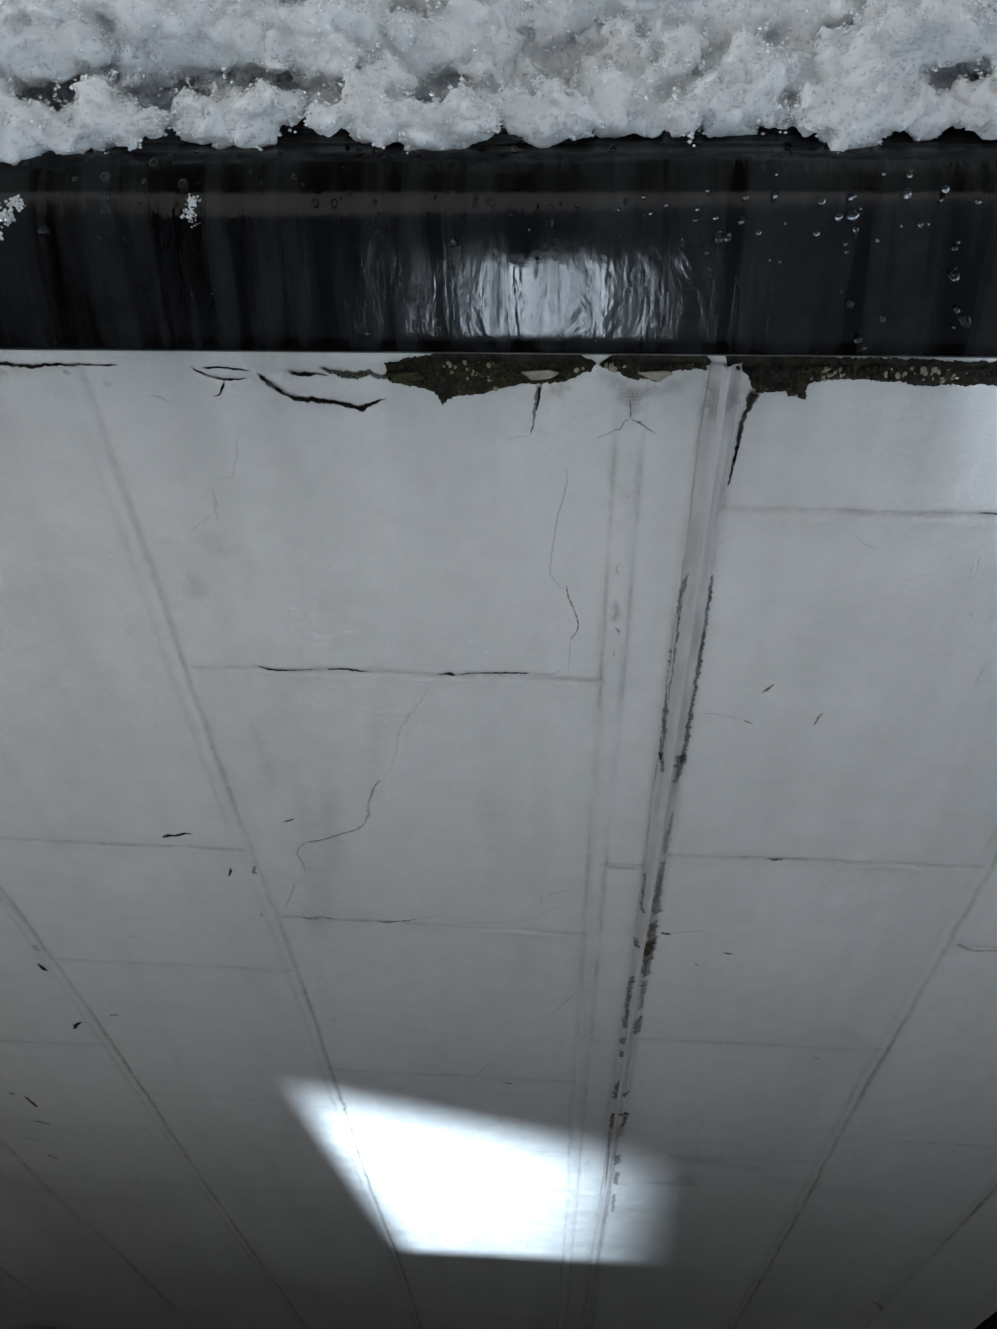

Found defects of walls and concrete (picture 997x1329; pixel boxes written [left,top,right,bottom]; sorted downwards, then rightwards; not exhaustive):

crack [193,366,391,412]
spalling [384,354,997,405]
crack [260,665,366,673]
crack [438,670,555,678]
damp [659,576,713,783]
damp [619,834,669,1057]